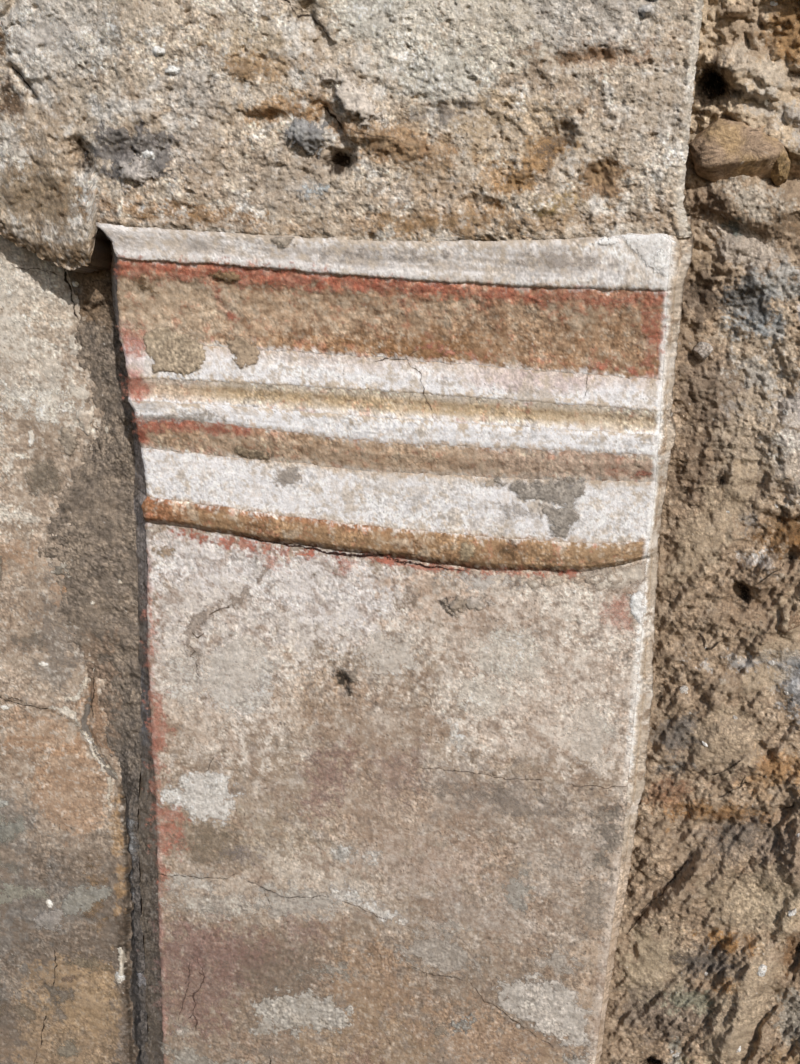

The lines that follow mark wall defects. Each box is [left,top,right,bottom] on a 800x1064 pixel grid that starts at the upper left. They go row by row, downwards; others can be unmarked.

crack [0,662,118,811]